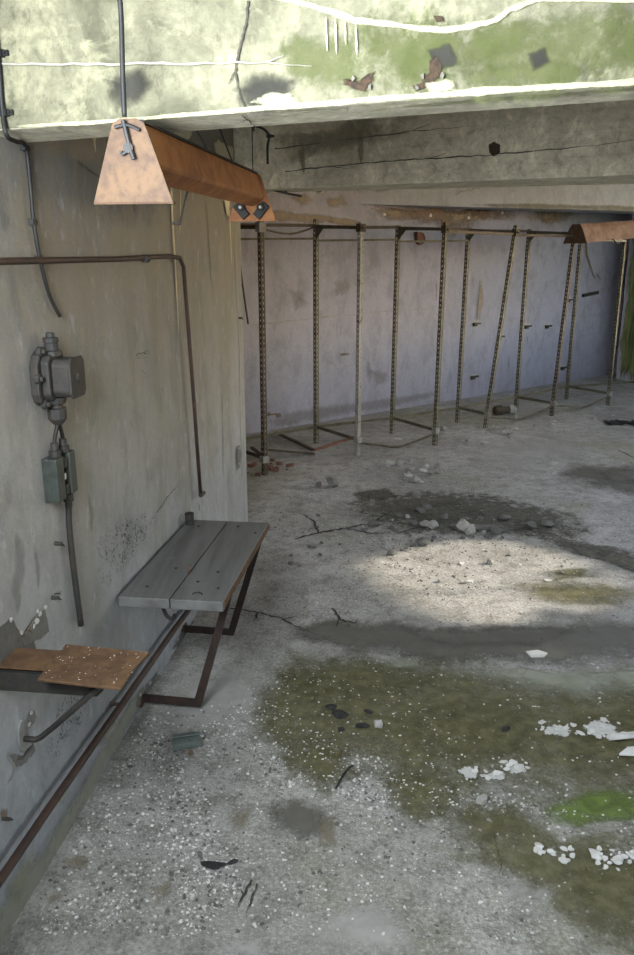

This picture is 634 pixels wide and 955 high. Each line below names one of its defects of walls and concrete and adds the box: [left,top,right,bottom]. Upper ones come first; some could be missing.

damp [279,0,634,54]
damp [430,45,456,67]
damp [530,49,547,68]
damp [111,71,146,103]
damp [240,77,289,113]
damp [564,466,634,493]
crack [296,509,407,539]
flaking render [0,605,49,664]
damp [297,620,634,691]
peeling [10,744,35,767]
damp [271,800,334,842]
damp [326,911,396,945]